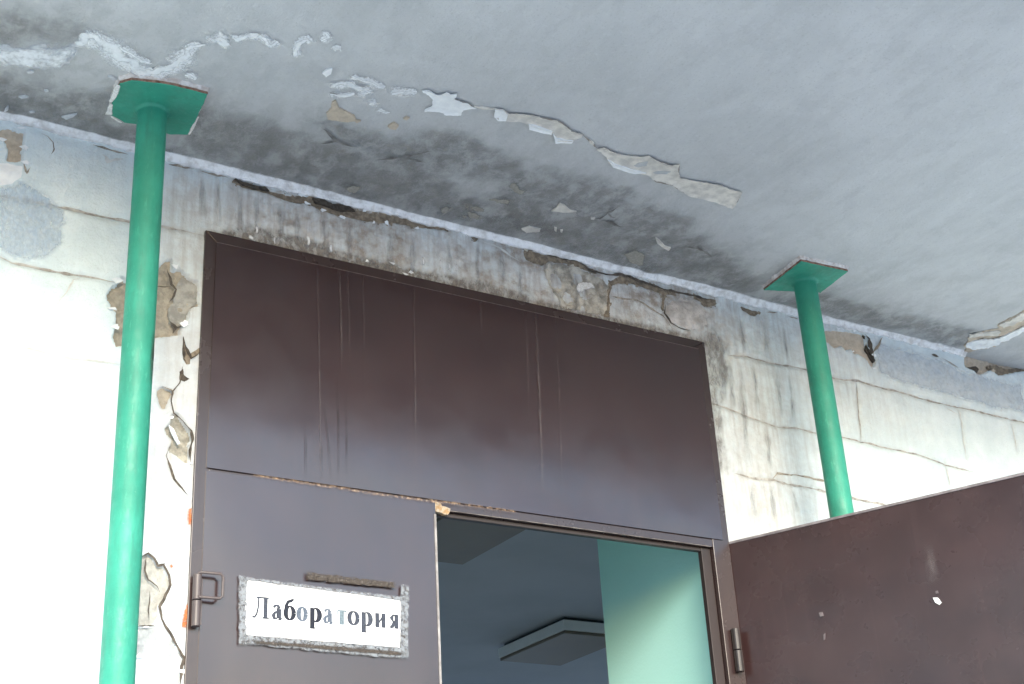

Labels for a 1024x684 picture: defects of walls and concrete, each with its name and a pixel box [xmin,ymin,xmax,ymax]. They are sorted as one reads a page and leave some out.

peeling [422,90,742,209]
flaking render [232,178,448,232]
flaking render [107,277,126,347]
flaking render [155,262,198,338]
damp [224,215,732,405]
crack [480,240,710,328]
crack [729,355,807,371]
flaking render [157,367,194,494]
crack [712,403,817,434]
crack [832,377,1024,483]
crack [735,472,826,493]
flaking render [137,552,185,684]